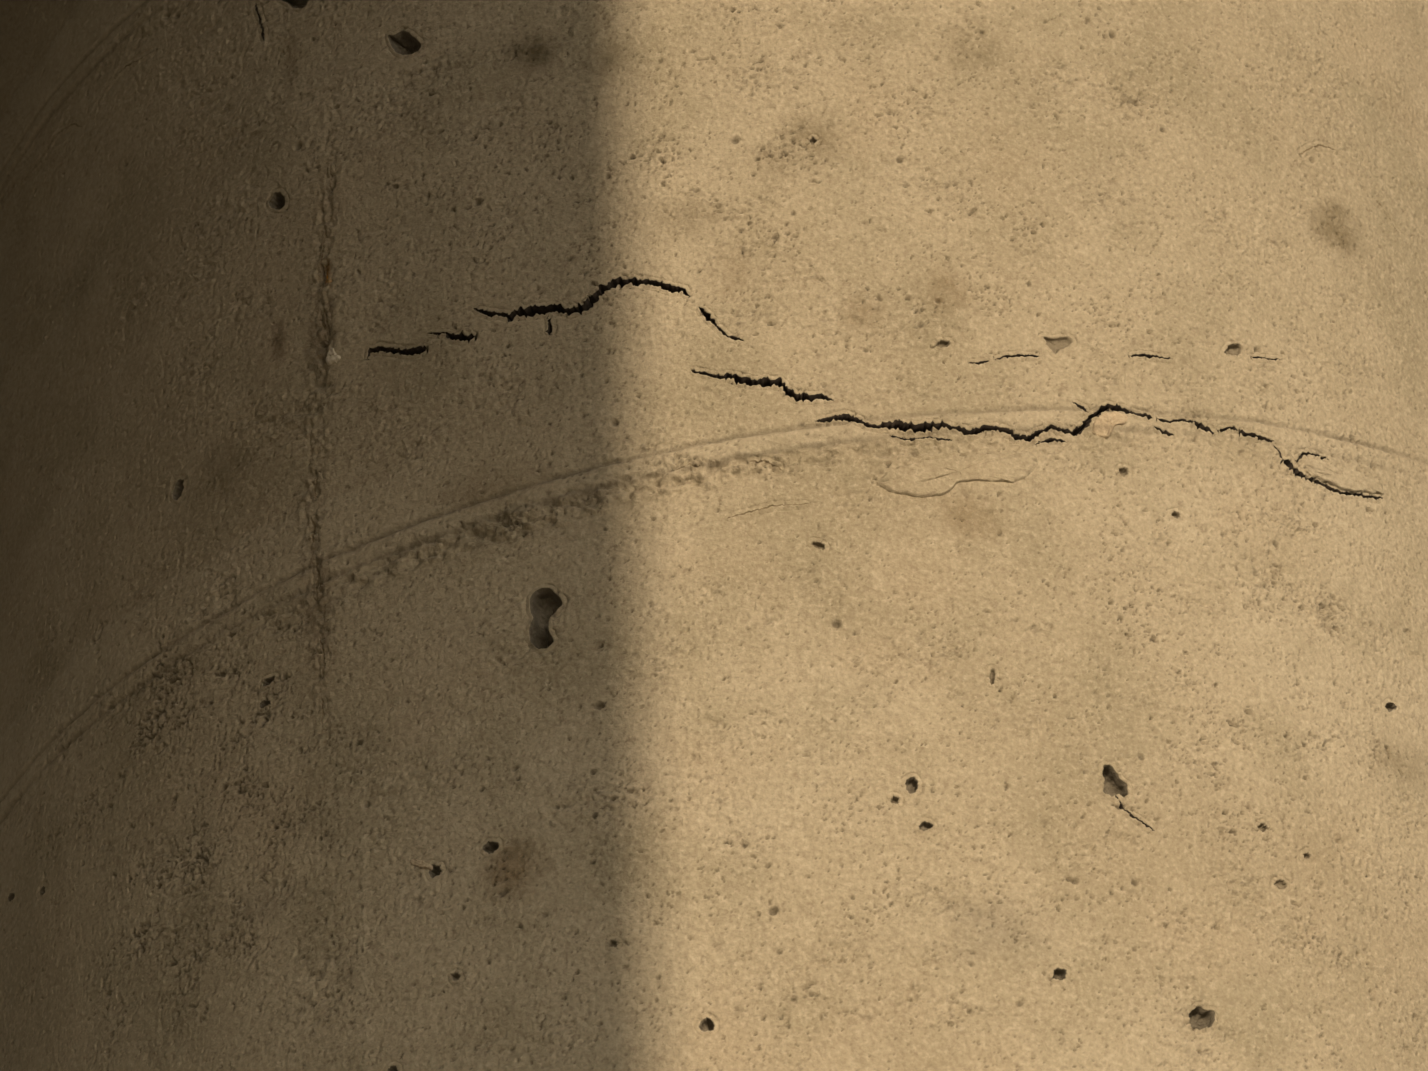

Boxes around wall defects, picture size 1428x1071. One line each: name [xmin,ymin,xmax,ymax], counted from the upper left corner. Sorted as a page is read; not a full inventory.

crack [317,163,336,343]
crack [364,274,1384,503]
crack [307,477,324,601]
crack [725,456,810,522]